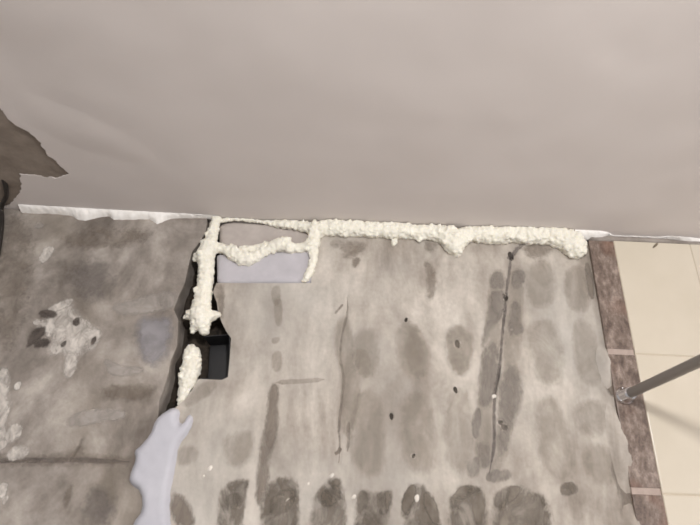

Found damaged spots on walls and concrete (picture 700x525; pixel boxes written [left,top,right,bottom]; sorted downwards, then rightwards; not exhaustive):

spalling [0,109,68,206]
crack [472,248,524,482]
damp [171,495,194,525]
damp [256,384,278,503]
crack [335,373,350,459]
damp [560,482,578,495]